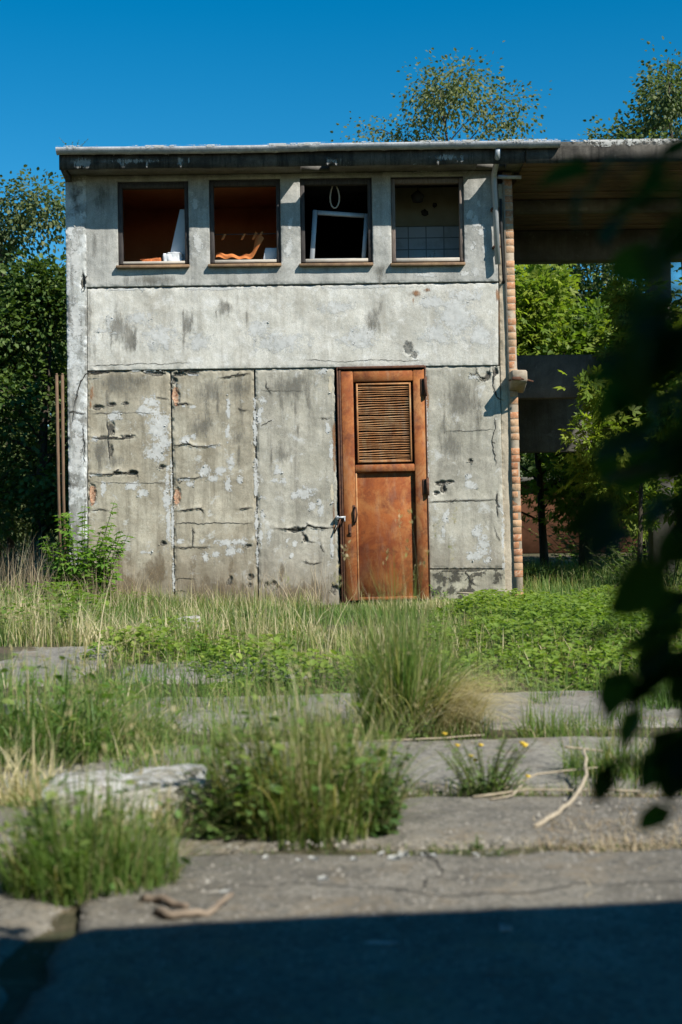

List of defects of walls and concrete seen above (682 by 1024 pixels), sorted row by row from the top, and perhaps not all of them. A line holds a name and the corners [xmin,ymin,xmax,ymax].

peeling [69,213,116,401]
water stain [112,319,135,349]
crack [69,362,308,484]
peeling [70,370,334,592]
crack [278,523,332,565]
peeling [466,510,506,570]